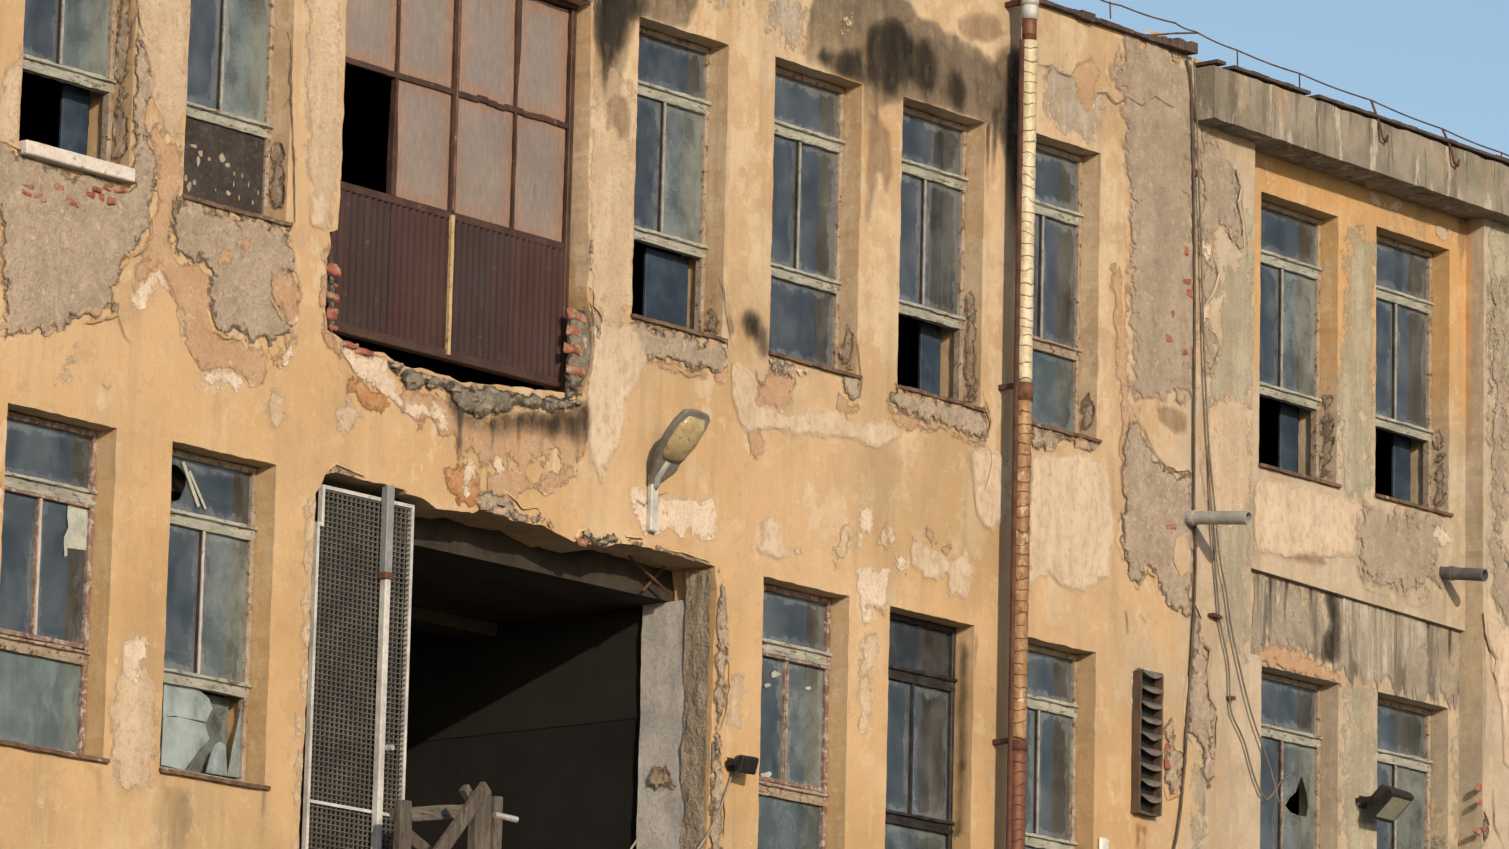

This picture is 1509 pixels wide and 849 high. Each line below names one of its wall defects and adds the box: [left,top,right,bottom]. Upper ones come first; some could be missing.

damp [597,0,697,78]
damp [810,0,1019,204]
flaking render [0,0,730,528]
flaking render [886,289,991,448]
flaking render [1031,392,1100,452]
peeling [1043,30,1253,801]
peeling [108,634,159,792]
peeling [290,497,316,849]
peeling [575,486,748,849]